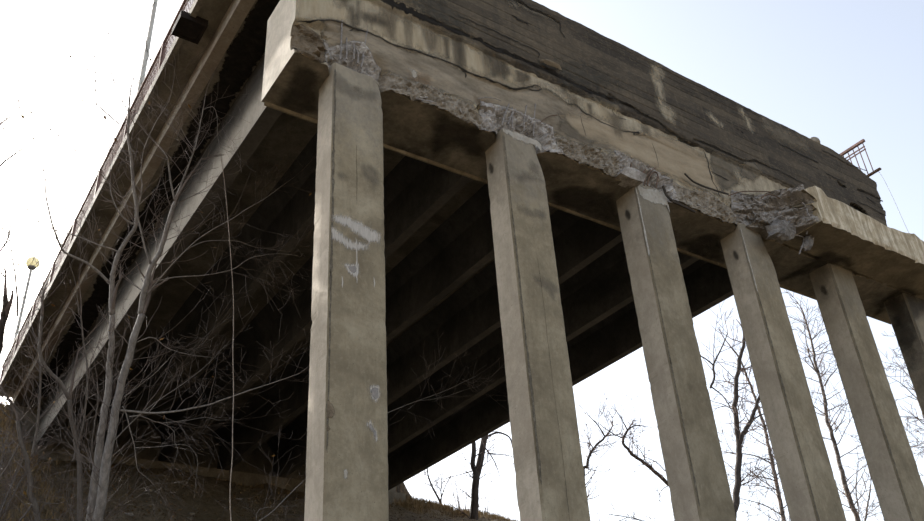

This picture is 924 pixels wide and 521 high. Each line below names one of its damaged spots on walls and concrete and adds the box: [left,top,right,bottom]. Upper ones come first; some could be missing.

damp [343,0,395,37]
damp [422,0,468,65]
damp [558,113,595,145]
crack [298,0,886,216]
efflorescence [652,65,674,122]
damp [741,109,809,151]
damp [710,150,763,192]
peeling [291,19,820,521]